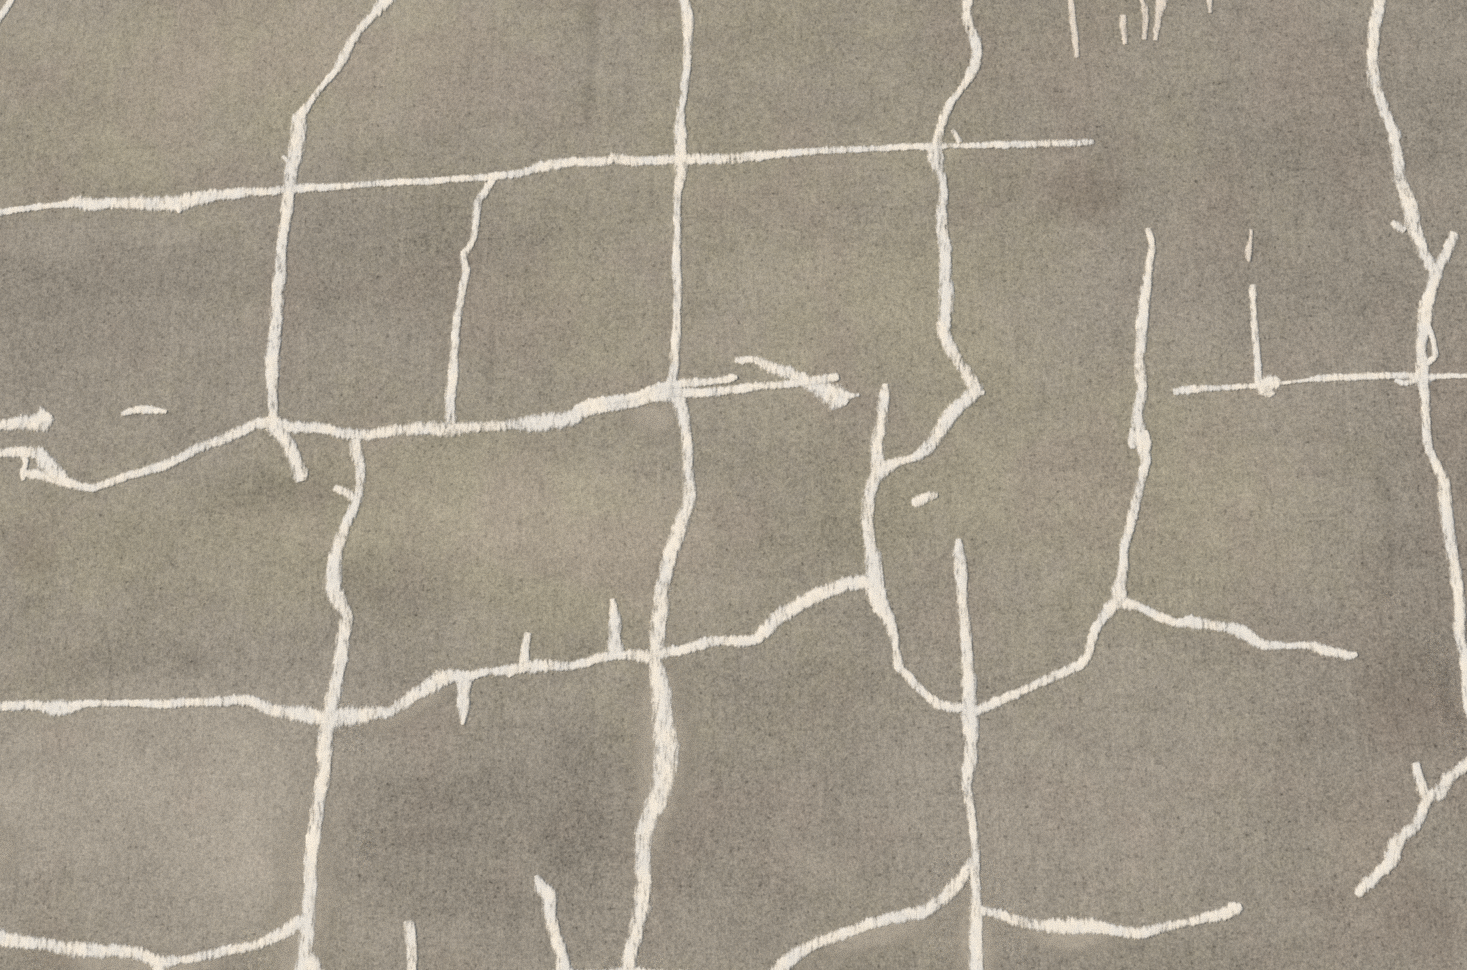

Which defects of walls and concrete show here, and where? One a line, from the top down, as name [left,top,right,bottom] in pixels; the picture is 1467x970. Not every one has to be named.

crack [0,0,874,970]
crack [736,0,1358,970]
crack [1173,0,1467,716]
crack [1355,758,1467,897]